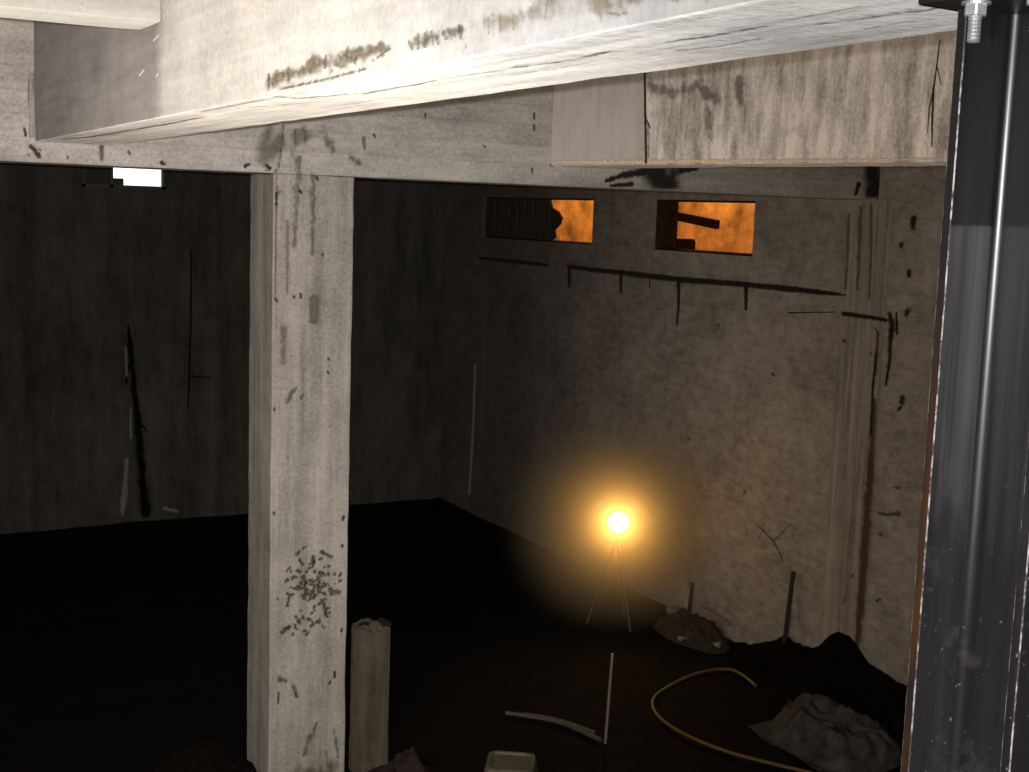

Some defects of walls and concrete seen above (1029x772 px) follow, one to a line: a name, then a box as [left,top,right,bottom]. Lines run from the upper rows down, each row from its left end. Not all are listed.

corrosion [594,0,633,16]
crack [125,325,151,517]